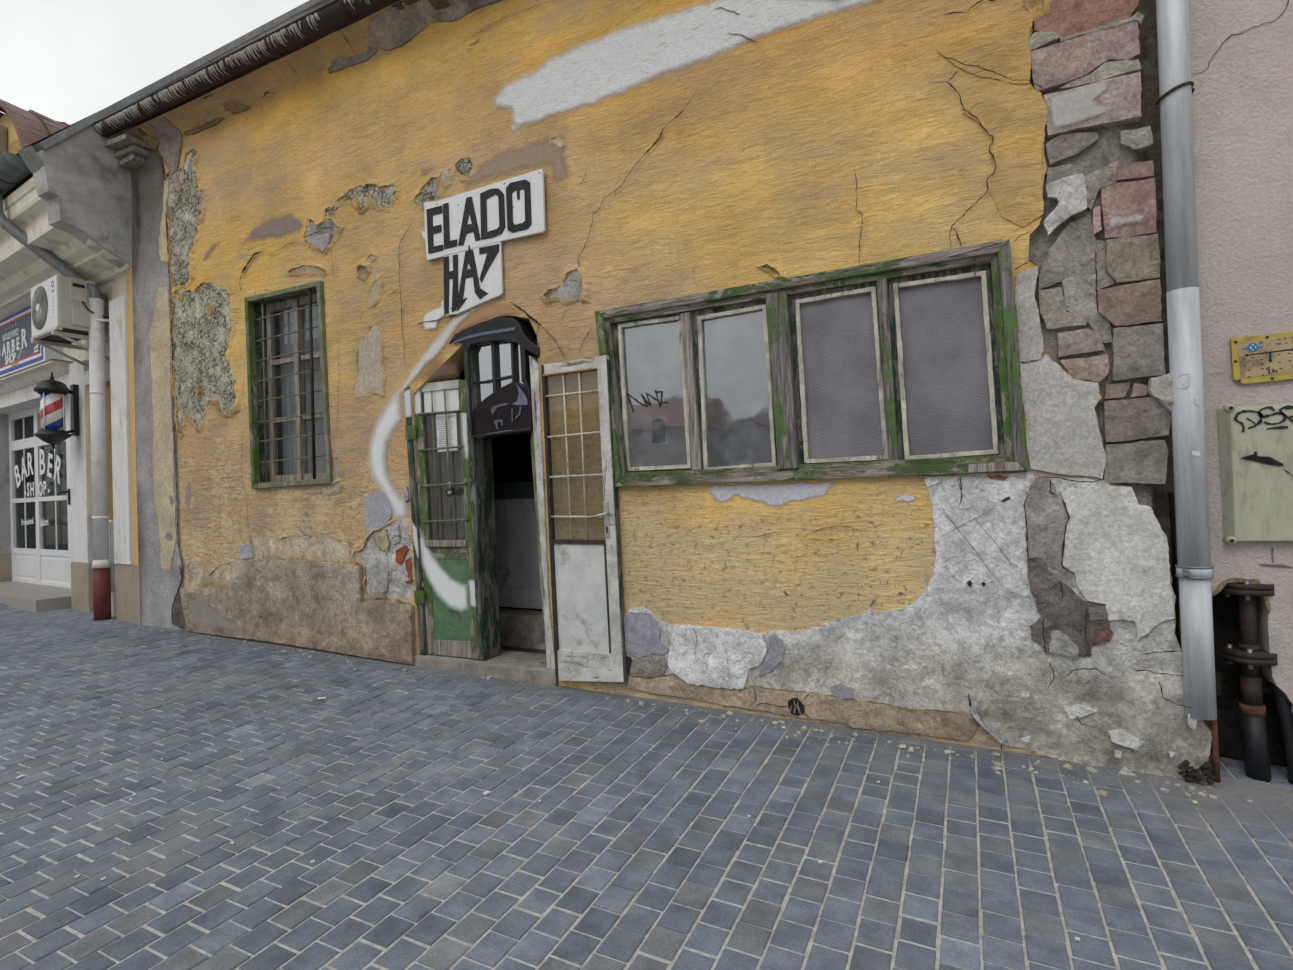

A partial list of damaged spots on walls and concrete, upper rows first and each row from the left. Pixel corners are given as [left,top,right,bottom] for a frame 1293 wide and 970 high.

spalling [326,0,502,74]
crack [1191,0,1289,75]
spalling [285,151,480,278]
crack [510,88,698,357]
crack [927,53,1043,249]
spalling [135,94,251,629]
peeling [352,251,387,400]
flaking render [624,0,1271,779]
spalling [250,486,423,610]
spalling [1260,667,1287,767]